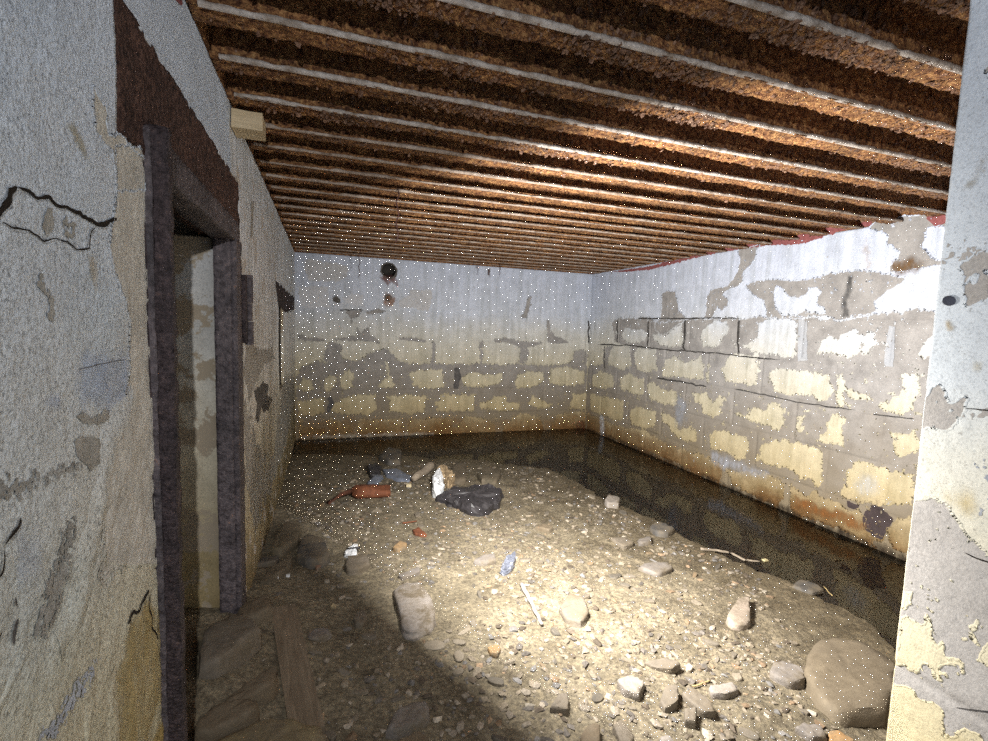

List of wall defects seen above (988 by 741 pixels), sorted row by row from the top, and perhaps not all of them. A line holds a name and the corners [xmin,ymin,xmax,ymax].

crack [0,186,117,251]
peeling [43,207,76,239]
peeling [37,273,55,321]
flaking render [91,84,158,592]
peeling [0,408,112,511]
peeling [243,214,988,741]
damp [576,416,907,566]
crack [0,518,22,577]
crack [0,598,19,645]